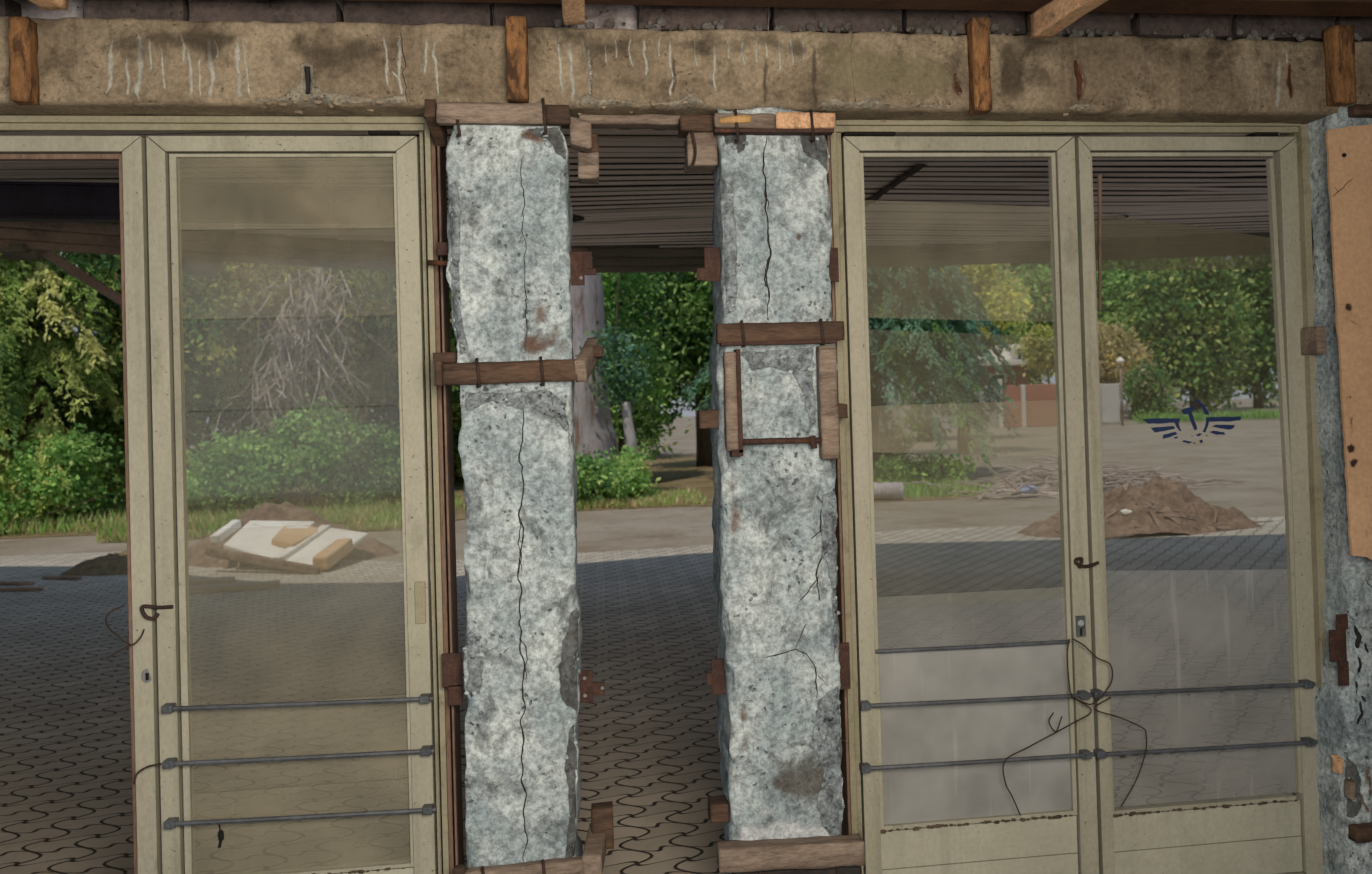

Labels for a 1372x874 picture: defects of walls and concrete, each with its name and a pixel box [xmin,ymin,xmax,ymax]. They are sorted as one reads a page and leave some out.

leakage [107,33,250,97]
crack [519,155,527,348]
crack [762,138,772,317]
crack [766,489,835,698]
spalling [1344,755,1362,818]